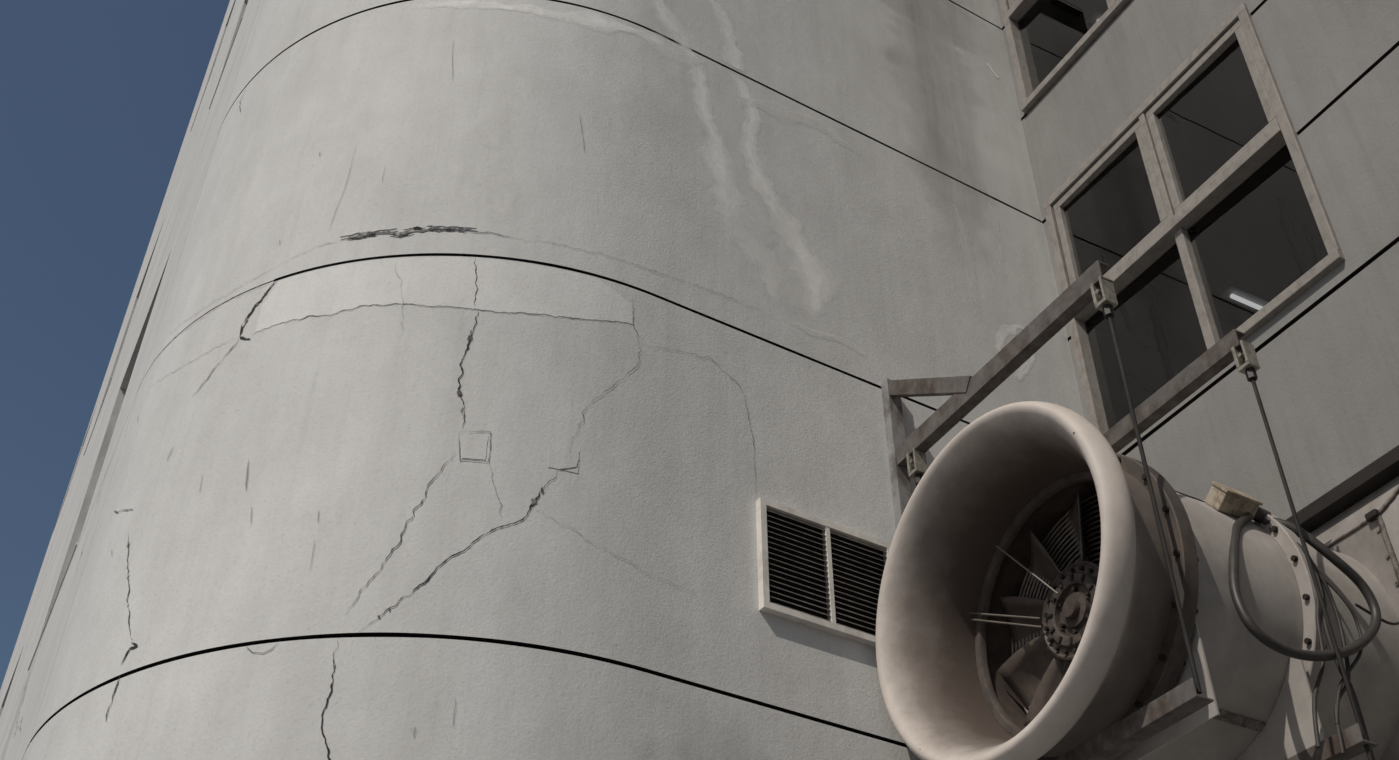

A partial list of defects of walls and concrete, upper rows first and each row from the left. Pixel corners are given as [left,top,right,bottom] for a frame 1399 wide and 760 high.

crack [153,280,276,391]
spalling [297,225,770,315]
damp [434,0,832,313]
crack [97,445,138,718]
crack [321,259,756,760]